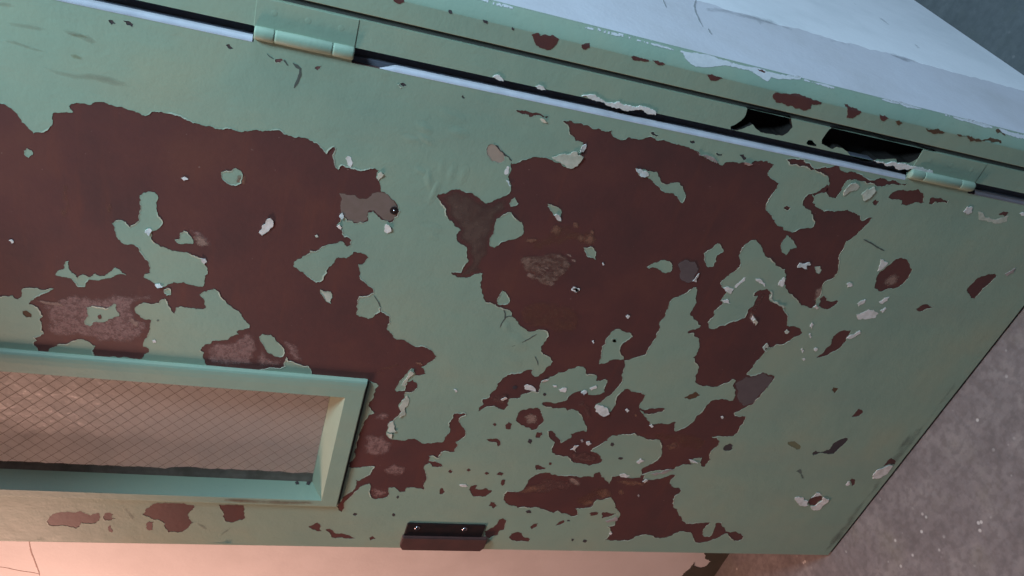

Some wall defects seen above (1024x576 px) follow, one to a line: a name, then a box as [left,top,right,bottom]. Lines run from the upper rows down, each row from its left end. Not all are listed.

flaking render [587,27,834,89]
peeling [773,92,822,111]
peeling [0,101,949,576]